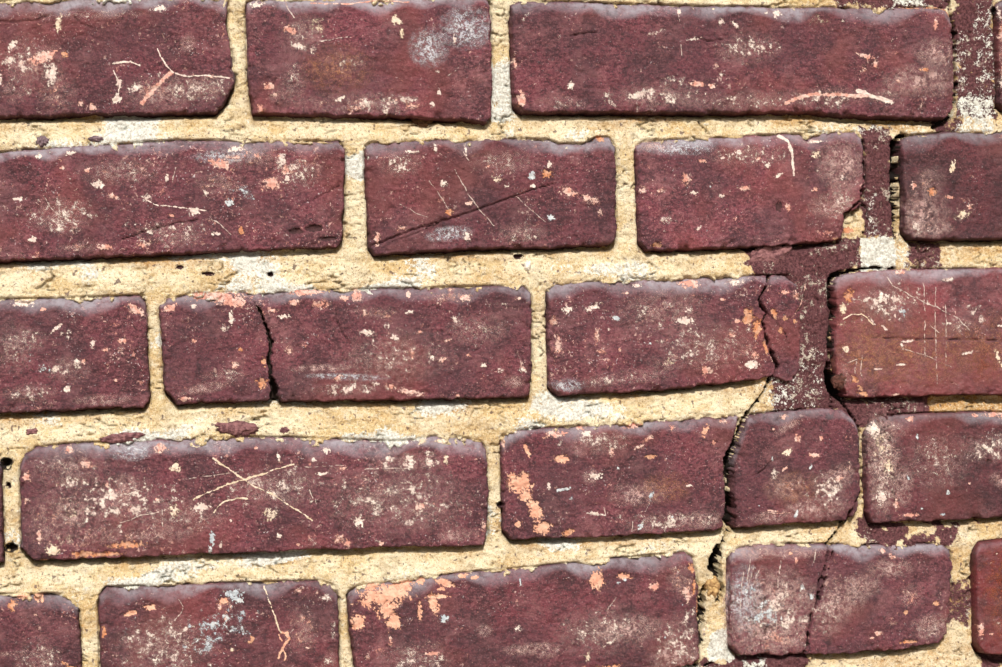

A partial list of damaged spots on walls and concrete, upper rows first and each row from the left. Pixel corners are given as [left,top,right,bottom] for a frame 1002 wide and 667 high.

crack [931,2,958,128]
crack [843,134,904,239]
crack [256,306,279,399]
crack [797,266,893,417]
crack [687,275,787,667]